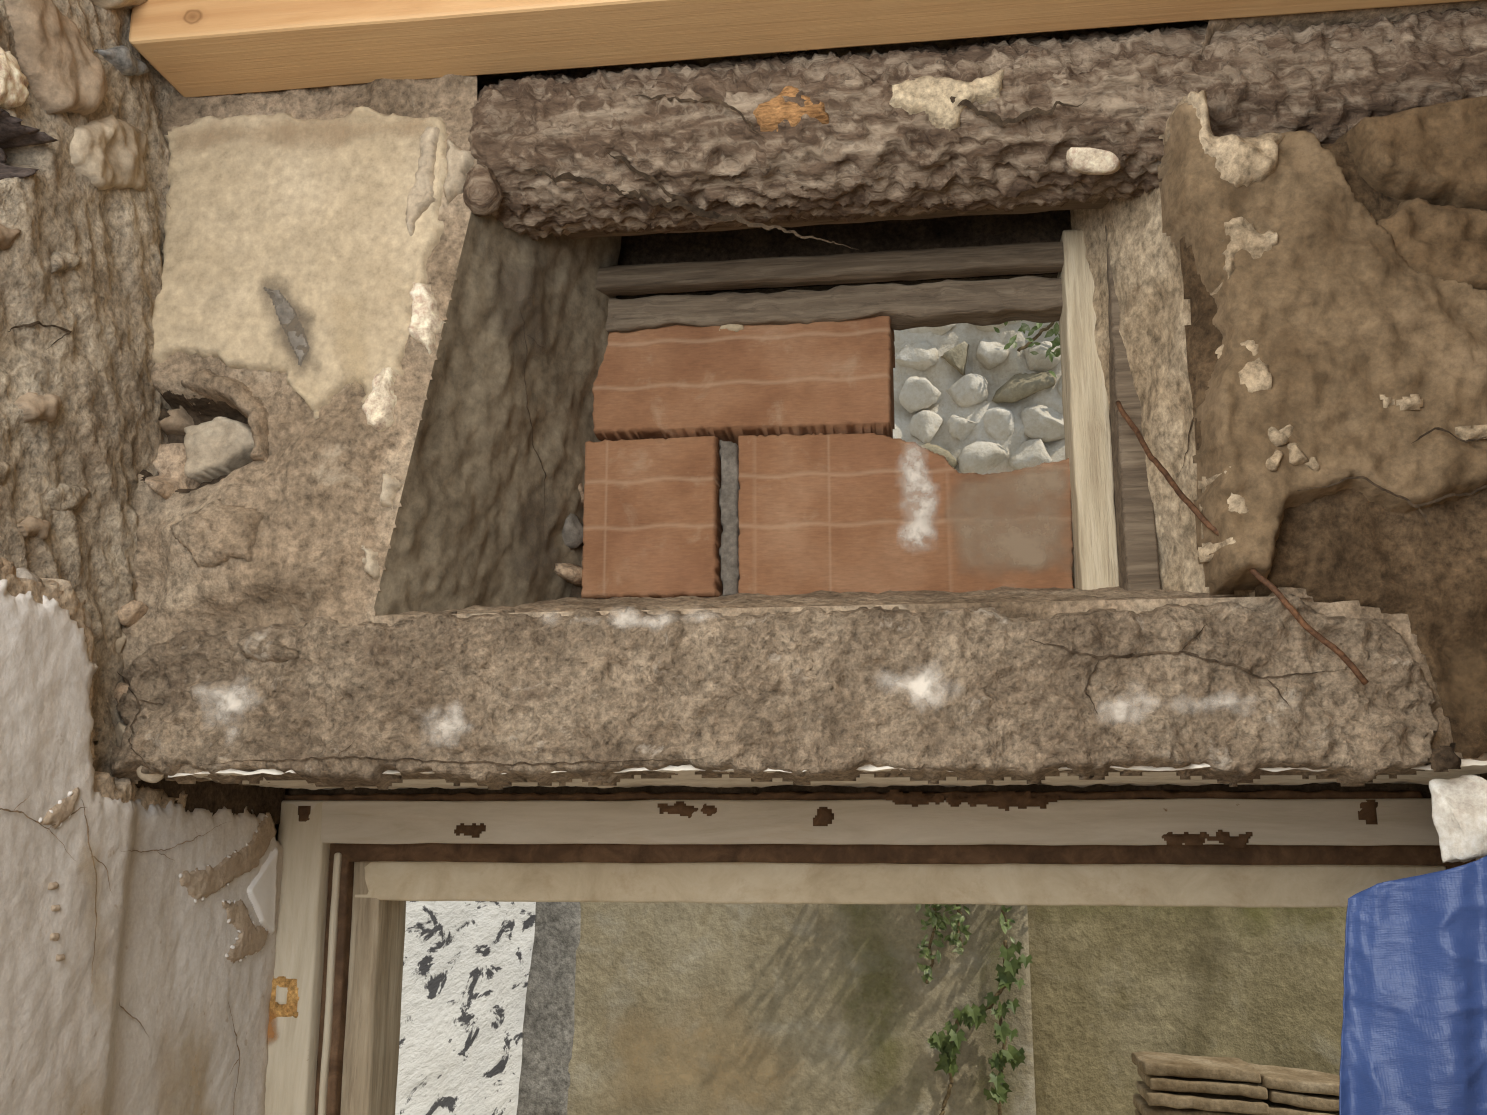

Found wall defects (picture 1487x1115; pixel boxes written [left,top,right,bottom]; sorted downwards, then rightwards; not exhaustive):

spalling [158,390,249,444]
crack [1411,427,1487,444]
water stain [905,450,933,544]
crack [1297,476,1487,526]
flaking render [0,557,188,829]
crack [1030,624,1347,714]
peeling [454,823,486,838]
peeling [657,801,717,818]
peeling [886,790,1059,811]
peeling [1162,830,1253,848]
flaking render [179,813,277,964]
corrosion [267,976,299,1041]